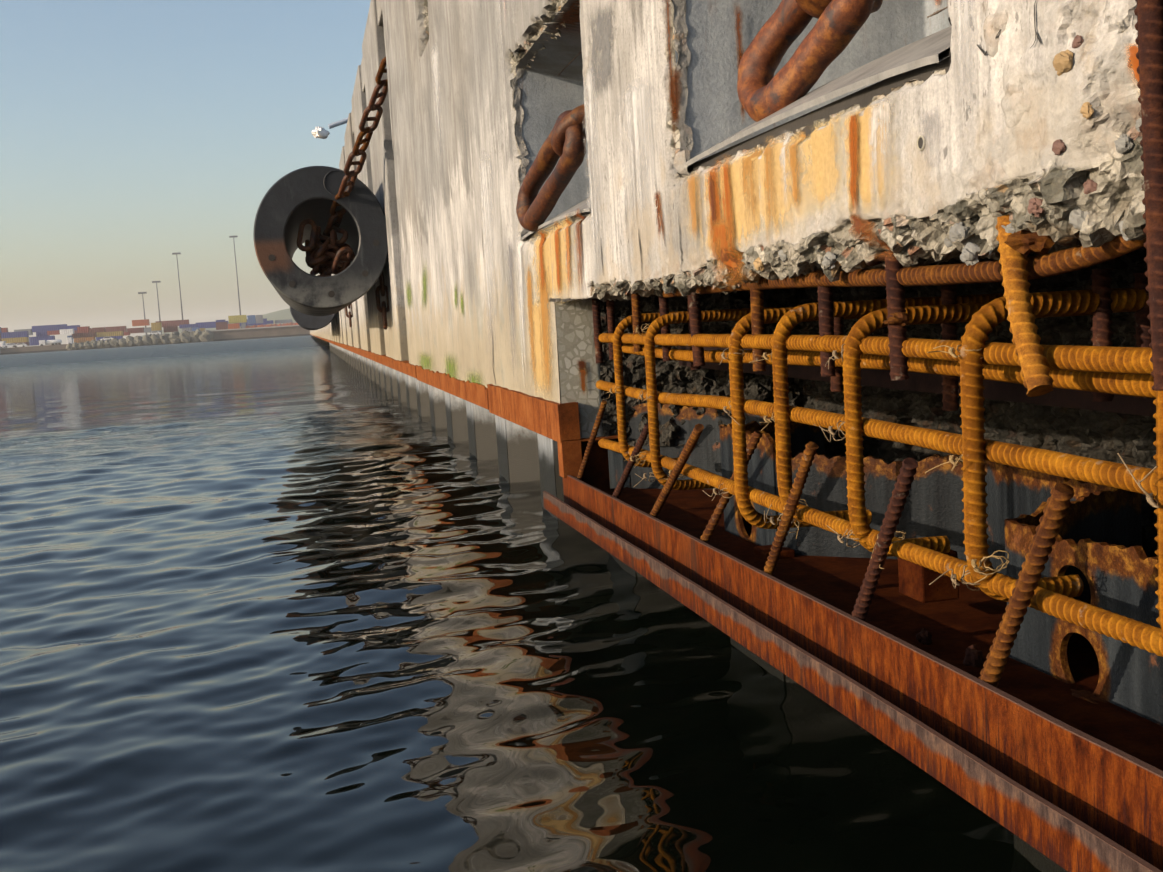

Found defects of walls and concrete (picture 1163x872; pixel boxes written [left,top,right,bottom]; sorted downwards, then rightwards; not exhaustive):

spalling [417,0,429,56]
spalling [509,0,580,69]
rust [527,212,586,392]
rust [687,101,892,283]
spalling [586,0,1163,469]
spalling [612,423,649,498]
spalling [650,423,704,518]
spalling [700,472,734,544]
spalling [763,428,846,576]
spalling [852,435,960,621]
spalling [978,483,1074,687]
spalling [1141,494,1158,558]